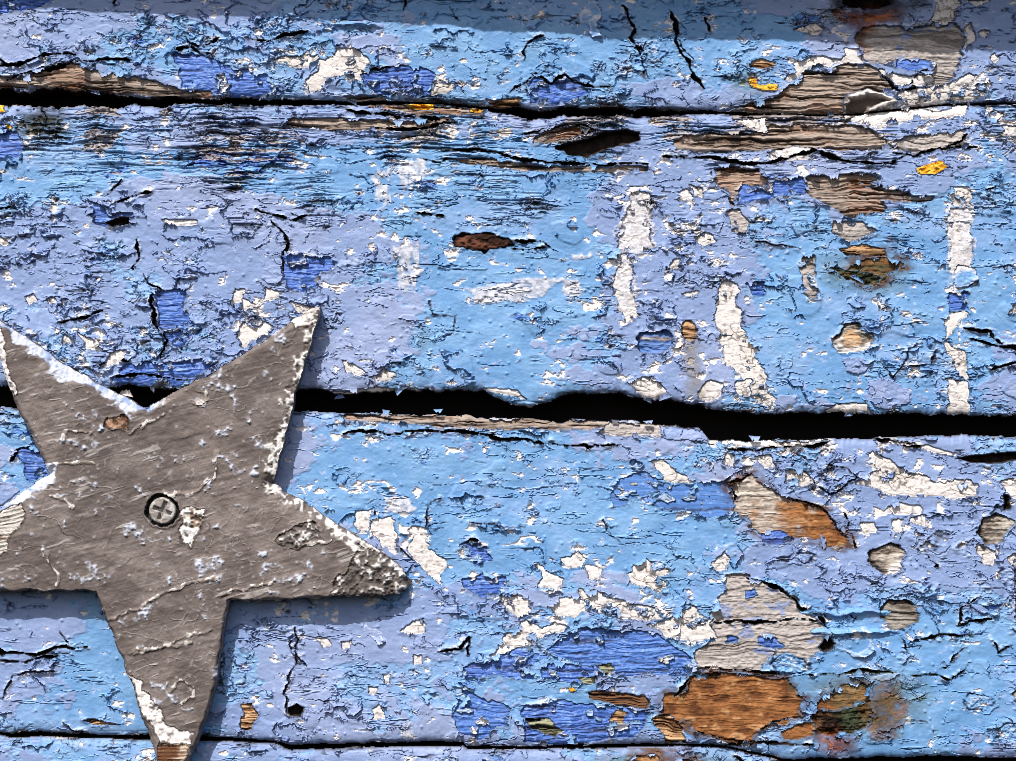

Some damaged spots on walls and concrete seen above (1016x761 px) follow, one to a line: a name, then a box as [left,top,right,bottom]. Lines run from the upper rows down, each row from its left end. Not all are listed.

peeling [0,129,27,161]
peeling [0,0,51,15]
peeling [0,43,488,134]
crack [622,5,645,73]
crack [346,109,977,167]
crack [670,12,705,89]
peeling [668,0,990,246]
peeling [151,285,194,347]
peeling [698,273,776,402]
peeling [940,187,978,415]
peeling [761,529,790,547]
peeling [451,542,830,747]